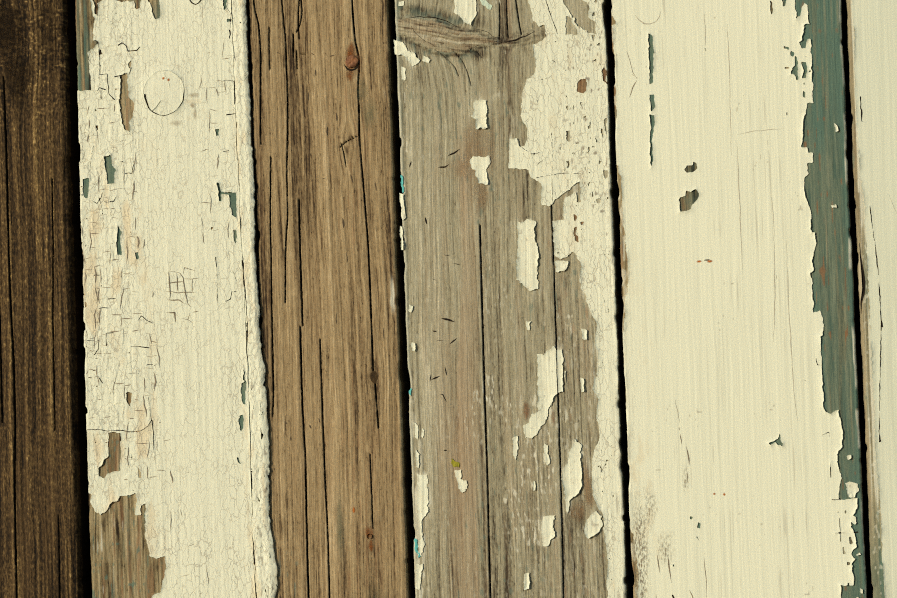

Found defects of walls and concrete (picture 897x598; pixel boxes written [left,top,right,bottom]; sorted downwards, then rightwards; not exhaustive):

peeling [75,0,102,91]
crack [80,10,248,483]
crack [253,0,384,598]
peeling [516,219,539,291]
crack [520,133,581,356]
peeling [603,165,630,332]
peeling [770,0,885,598]
peeling [98,432,121,478]
peeling [89,493,166,598]
peeling [512,346,566,460]
crack [556,380,564,598]
peeling [561,439,582,512]